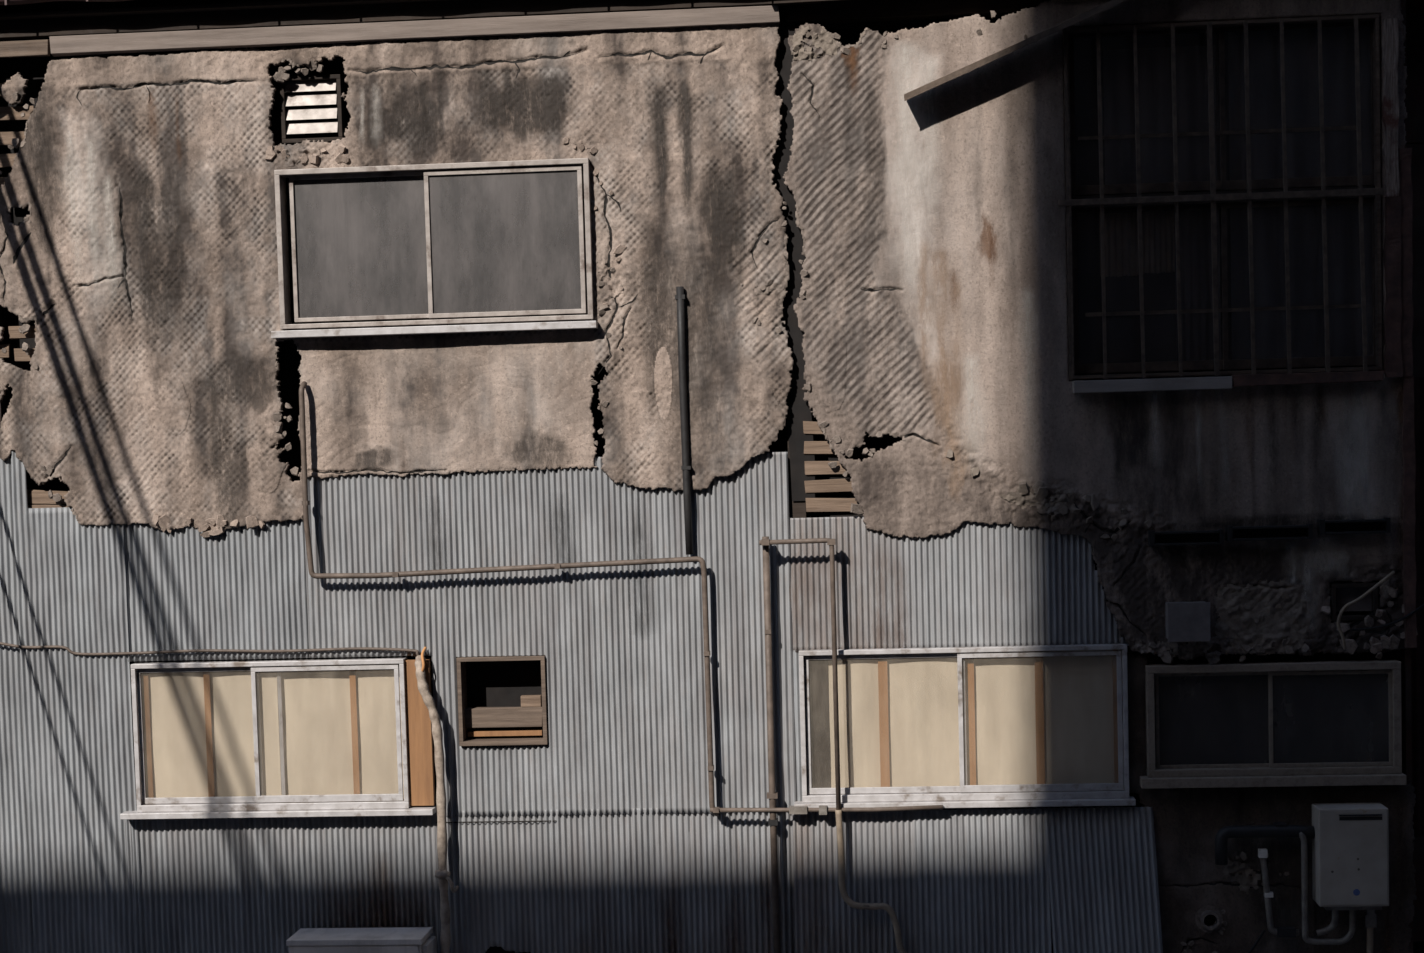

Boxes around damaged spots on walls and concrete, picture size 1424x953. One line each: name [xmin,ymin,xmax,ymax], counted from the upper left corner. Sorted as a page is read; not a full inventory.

peeling [273,59,324,84]
damp [373,75,441,151]
damp [480,70,565,139]
spalling [790,25,851,61]
spalling [265,143,350,166]
crack [0,224,31,308]
crack [43,184,133,318]
crack [750,25,821,501]
peeling [2,323,39,370]
spalling [1000,481,1128,541]
spalling [1321,563,1418,660]
spalling [1134,636,1311,665]